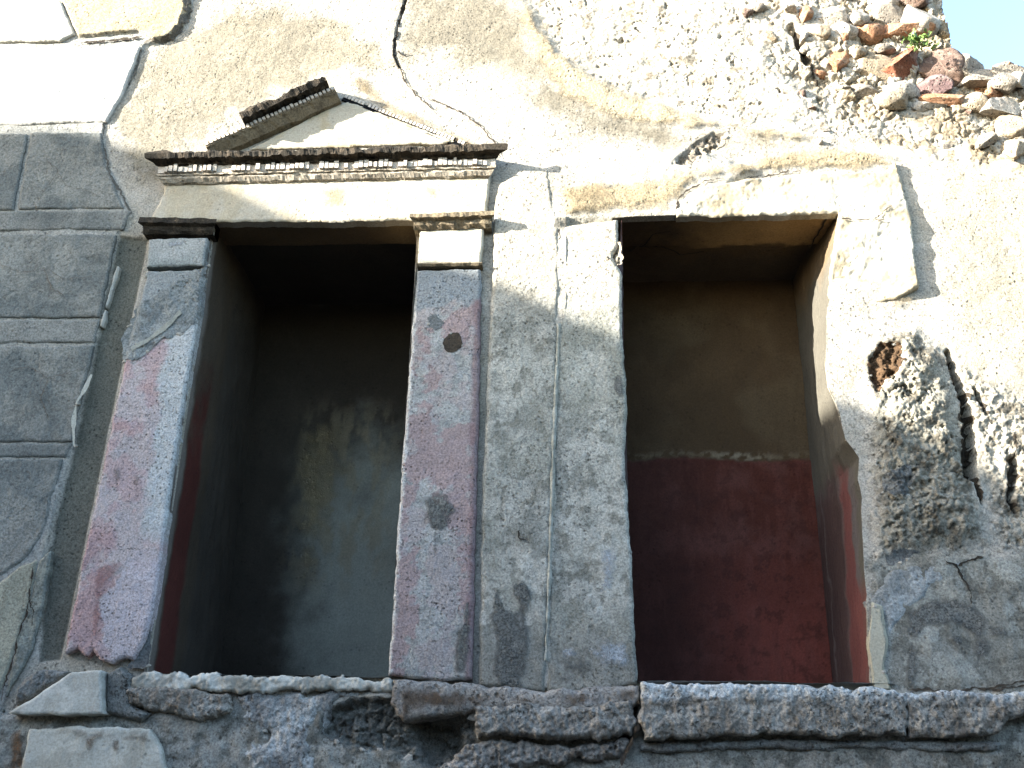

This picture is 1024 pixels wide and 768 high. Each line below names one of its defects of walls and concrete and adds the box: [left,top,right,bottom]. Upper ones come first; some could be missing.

crack [392,0,501,157]
spalling [675,132,729,165]
spalling [427,314,463,352]
spalling [867,341,910,391]
crack [946,359,1021,510]
damp [426,493,455,529]
damp [491,582,529,688]